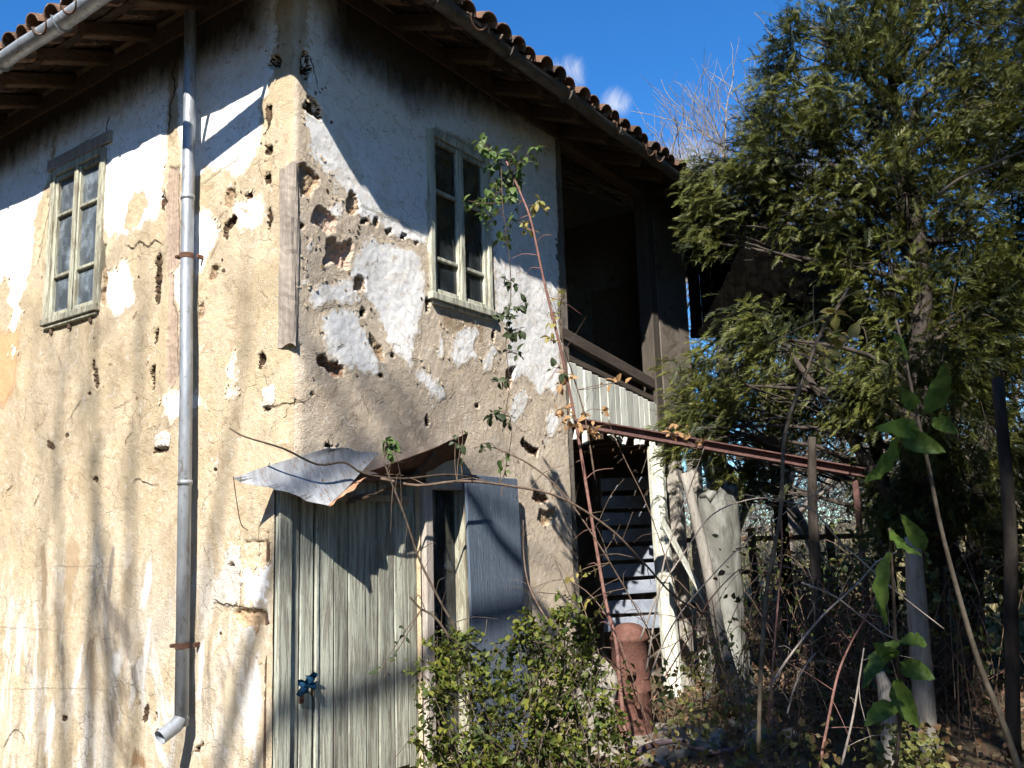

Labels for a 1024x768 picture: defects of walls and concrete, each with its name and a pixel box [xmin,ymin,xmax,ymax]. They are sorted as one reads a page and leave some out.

peeling [0,0,286,360]
peeling [296,0,562,469]
flaking render [87,337,111,395]
peeling [147,360,179,453]
peeling [193,386,204,414]
peeling [224,346,241,401]
flaking render [262,385,276,411]
crack [263,373,306,429]
crack [214,599,266,610]